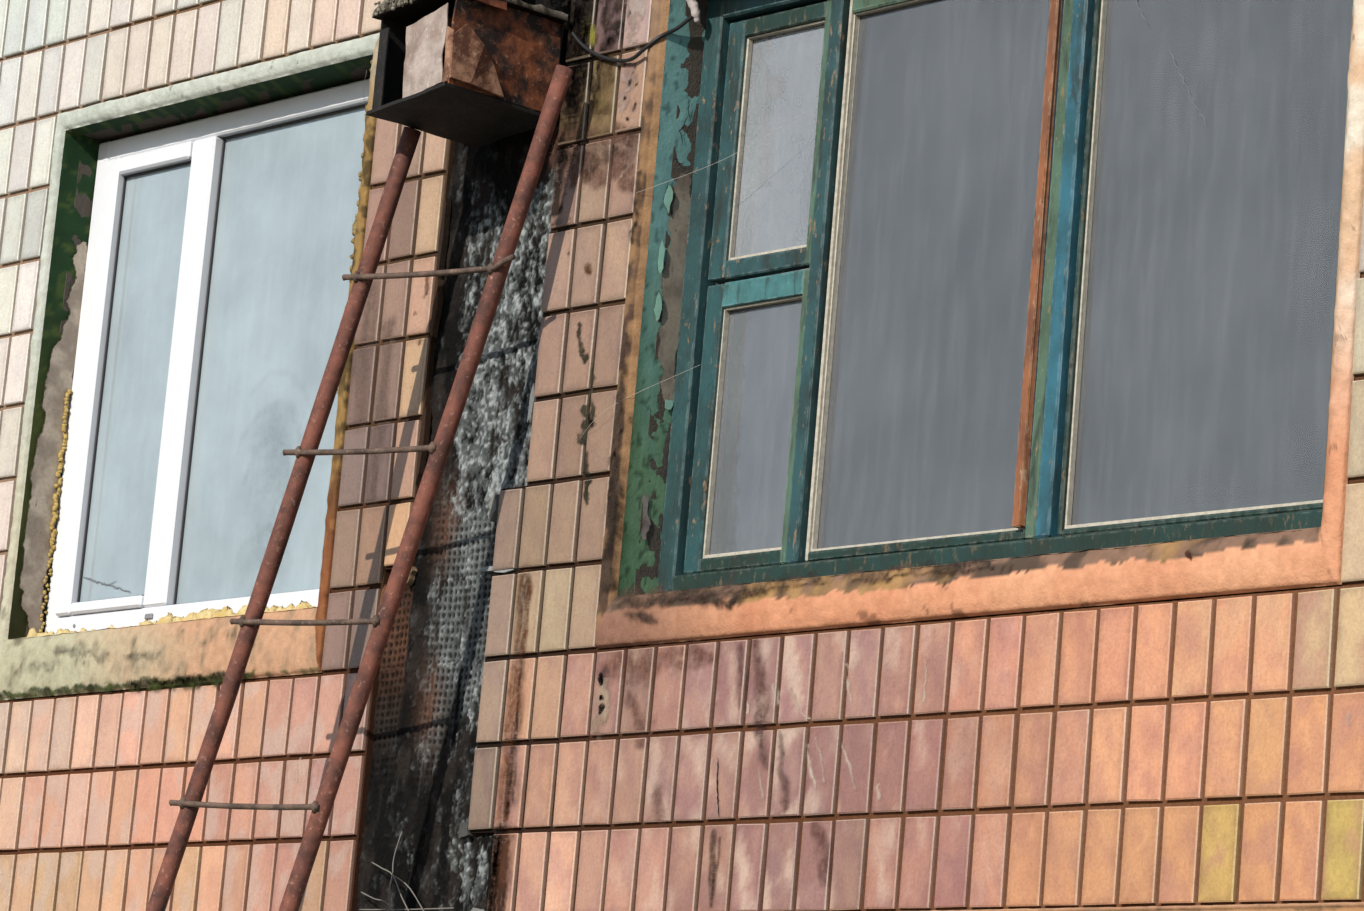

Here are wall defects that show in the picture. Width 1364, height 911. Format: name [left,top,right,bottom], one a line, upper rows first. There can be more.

water stain [552,0,645,243]
peeling [654,173,692,410]
peeling [641,495,651,540]
water stain [601,333,821,622]
water stain [739,639,788,809]
water stain [485,826,512,911]
water stain [708,832,720,906]